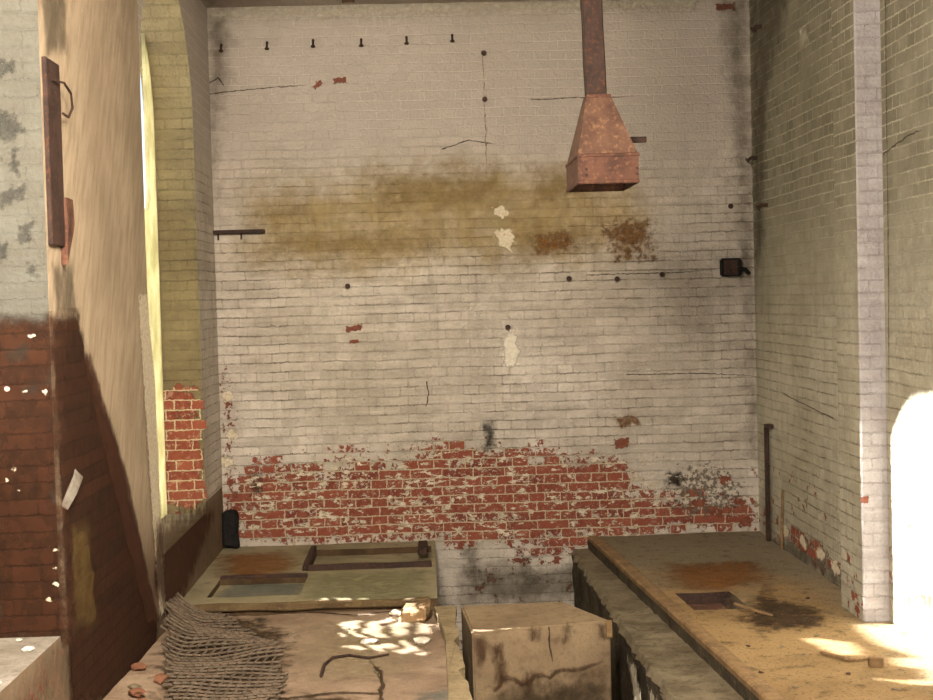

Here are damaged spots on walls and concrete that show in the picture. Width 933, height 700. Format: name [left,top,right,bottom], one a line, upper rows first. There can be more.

water stain [742,0,783,248]
peeling [492,205,515,253]
corrosion [536,231,571,255]
corrosion [602,218,657,262]
spalling [346,323,363,344]
peeling [503,331,520,367]
peeling [138,292,208,558]
peeling [219,366,759,700]
peeling [774,518,841,576]
crack [278,659,385,700]